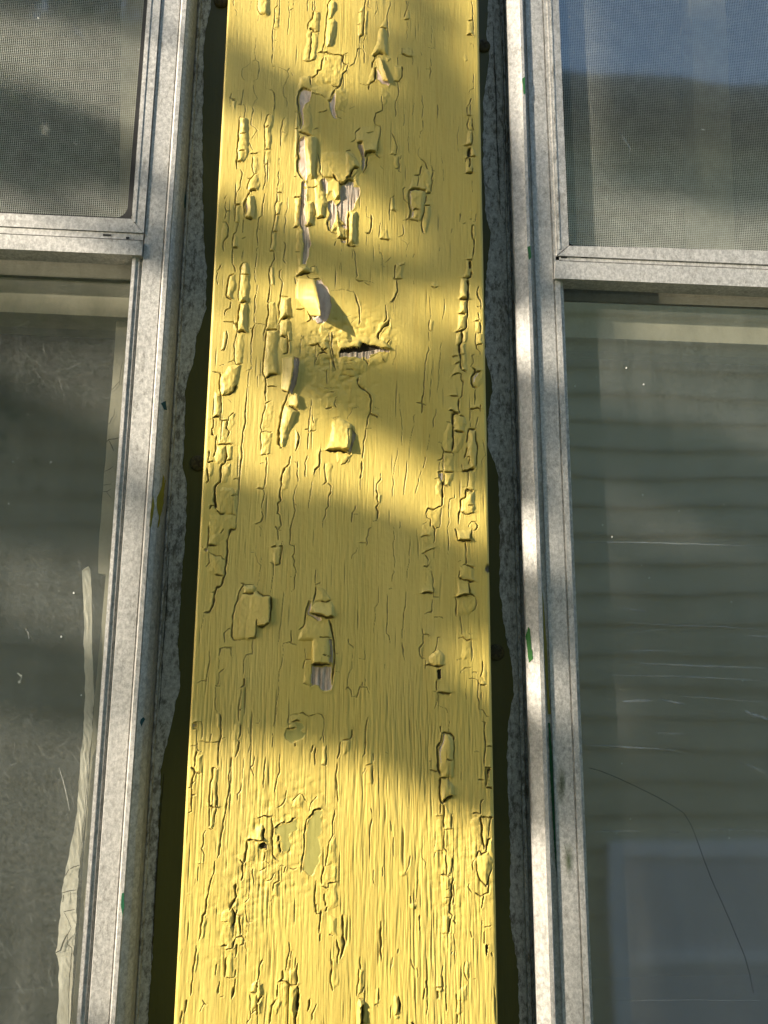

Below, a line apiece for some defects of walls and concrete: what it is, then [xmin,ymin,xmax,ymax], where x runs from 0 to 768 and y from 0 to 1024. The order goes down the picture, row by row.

peeling [256,0,405,449]
peeling [401,164,437,223]
peeling [324,418,356,466]
crack [175,0,478,1024]
peeling [297,568,341,691]
crack [460,659,492,718]
peeling [422,718,494,1024]
crack [480,902,495,958]